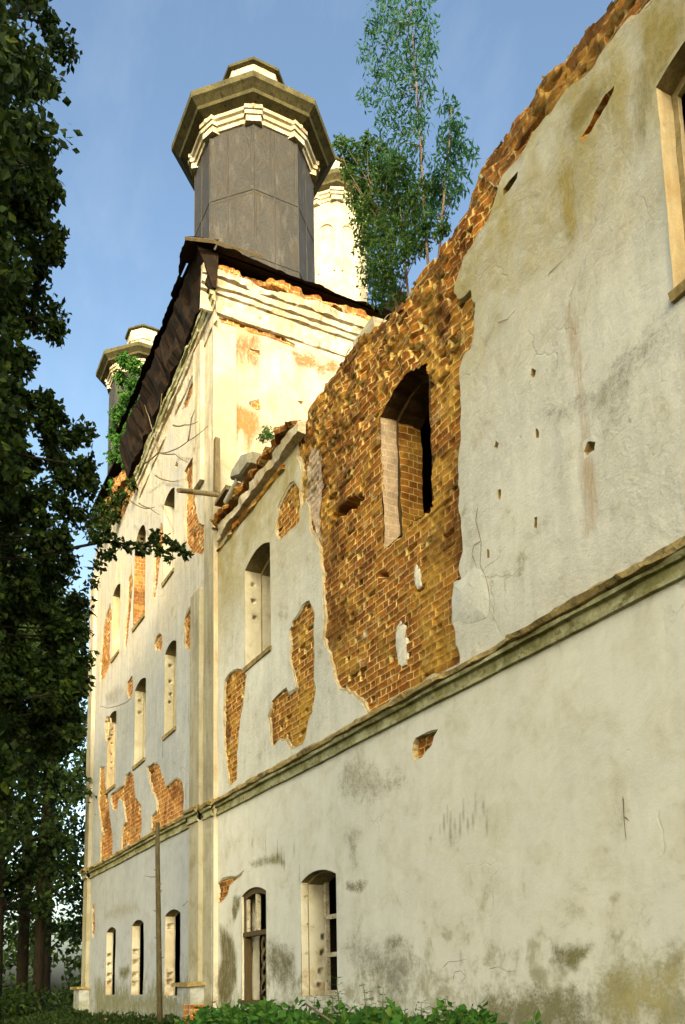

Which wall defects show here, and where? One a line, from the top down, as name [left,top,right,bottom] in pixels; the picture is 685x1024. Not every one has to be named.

flaking render [267,0,651,750]
flaking render [175,457,204,555]
crack [472,507,490,608]
flaking render [223,669,247,787]
flaking render [412,729,438,760]
flaking render [98,762,184,862]
leakage [488,990,584,1024]
leakage [555,948,588,966]